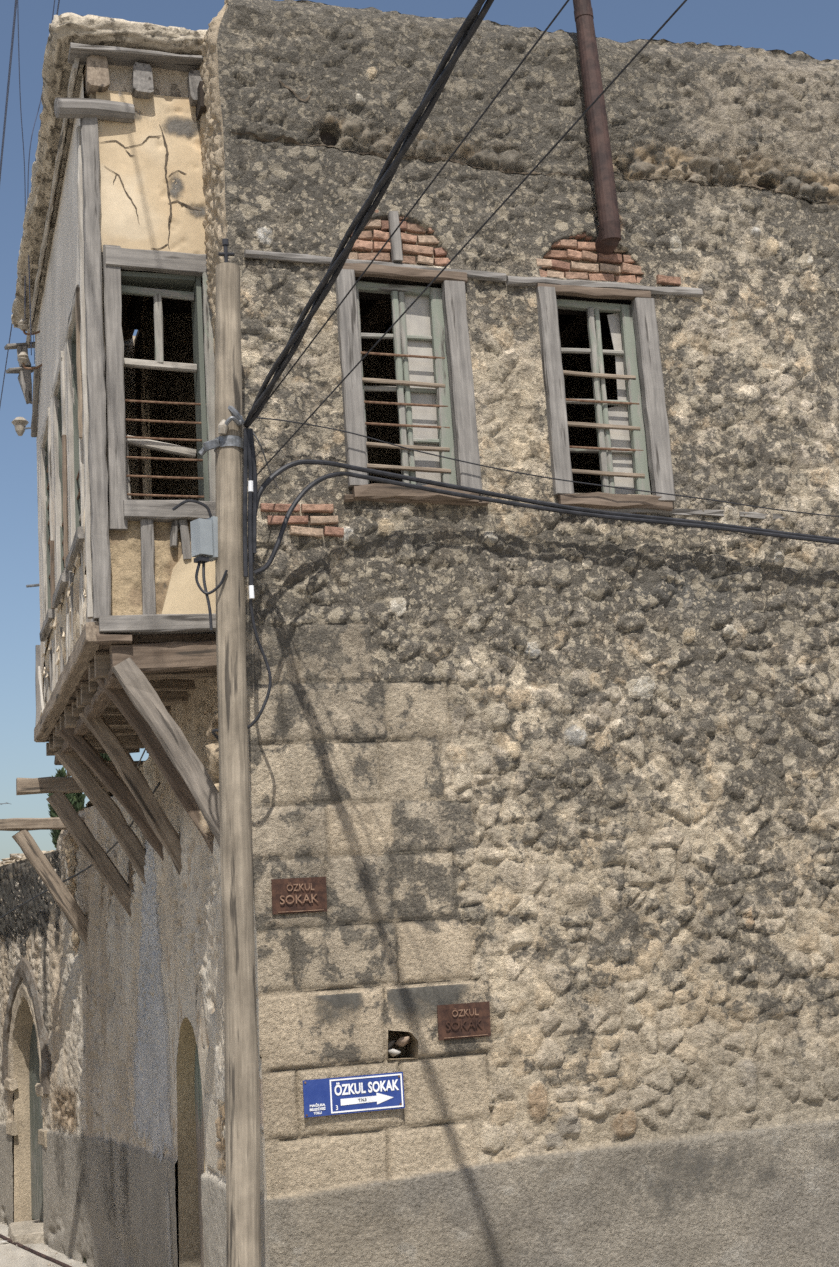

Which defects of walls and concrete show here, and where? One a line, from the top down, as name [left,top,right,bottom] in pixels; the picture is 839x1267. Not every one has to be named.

crack [104,124,202,249]
spalling [347,209,450,266]
spalling [536,232,681,287]
spalling [260,503,344,538]
spalling [215,1101,226,1177]